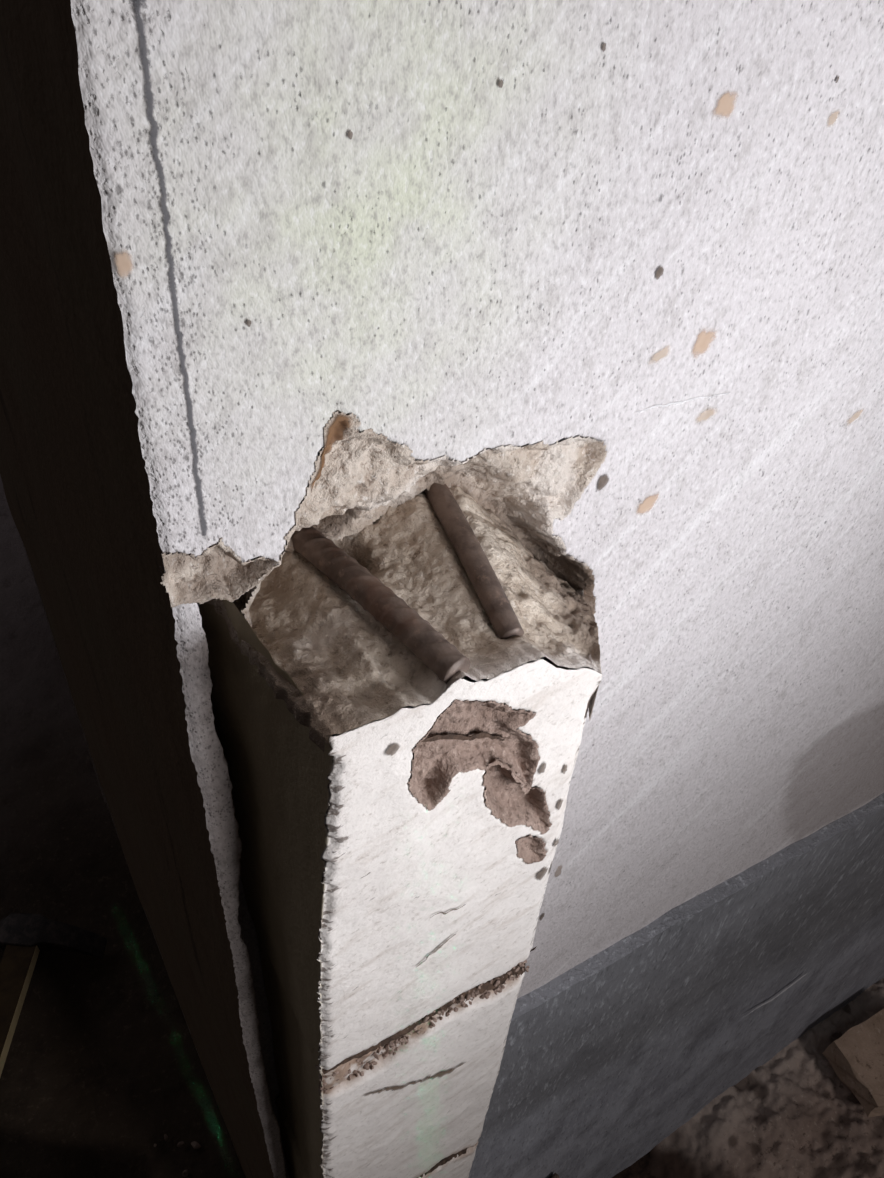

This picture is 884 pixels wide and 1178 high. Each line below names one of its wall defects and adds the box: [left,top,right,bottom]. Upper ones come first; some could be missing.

rust [312,415,351,489]
spalling [160,412,609,684]
spalling [386,699,563,880]
crack [319,946,537,1096]
crack [419,1148,467,1177]